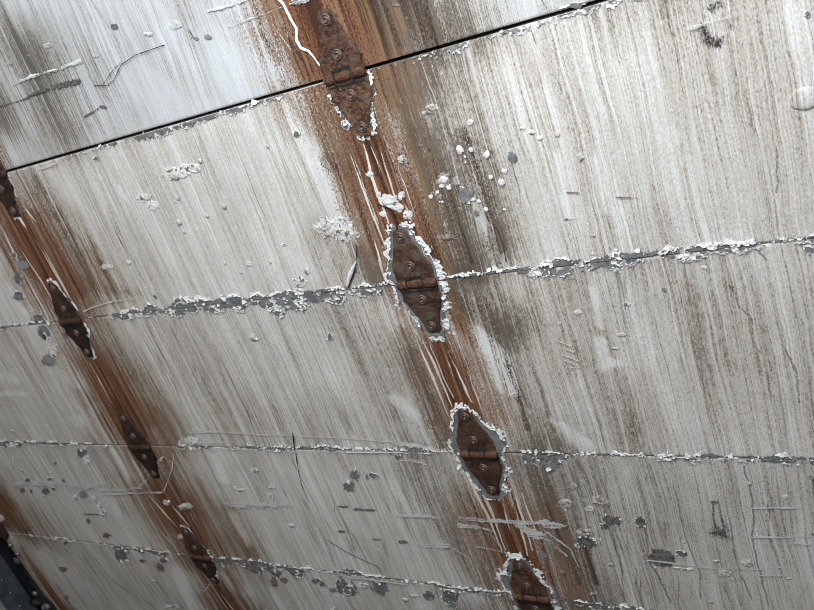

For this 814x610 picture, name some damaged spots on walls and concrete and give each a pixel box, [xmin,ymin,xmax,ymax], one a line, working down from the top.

crack [94,45,164,86]
peeling [325,68,380,141]
peeling [402,42,468,64]
corrosion [240,0,514,440]
peeling [108,191,814,342]
peeling [46,278,97,359]
corrosion [0,178,267,610]
peeling [175,402,513,501]
peeling [521,449,814,472]
peeling [177,525,649,610]
corrosion [448,464,587,610]
peeling [647,541,695,571]